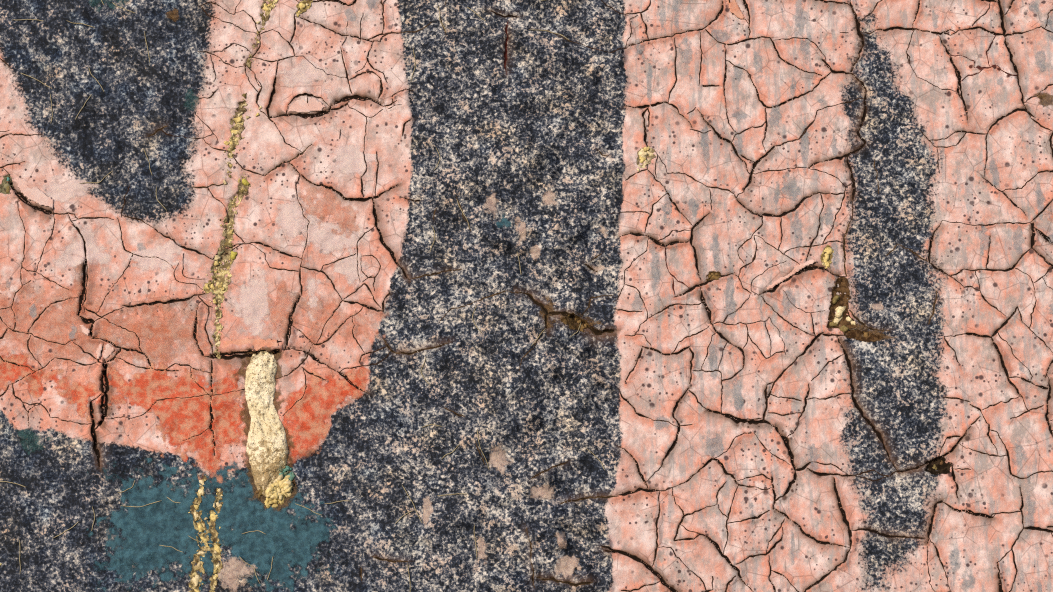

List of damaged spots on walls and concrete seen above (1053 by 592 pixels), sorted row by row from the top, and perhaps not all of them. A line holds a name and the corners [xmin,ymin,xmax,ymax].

peeling [0,174,54,209]
crack [0,0,471,467]
crack [439,0,1053,592]
spalling [924,457,952,475]
flaking render [193,480,222,567]